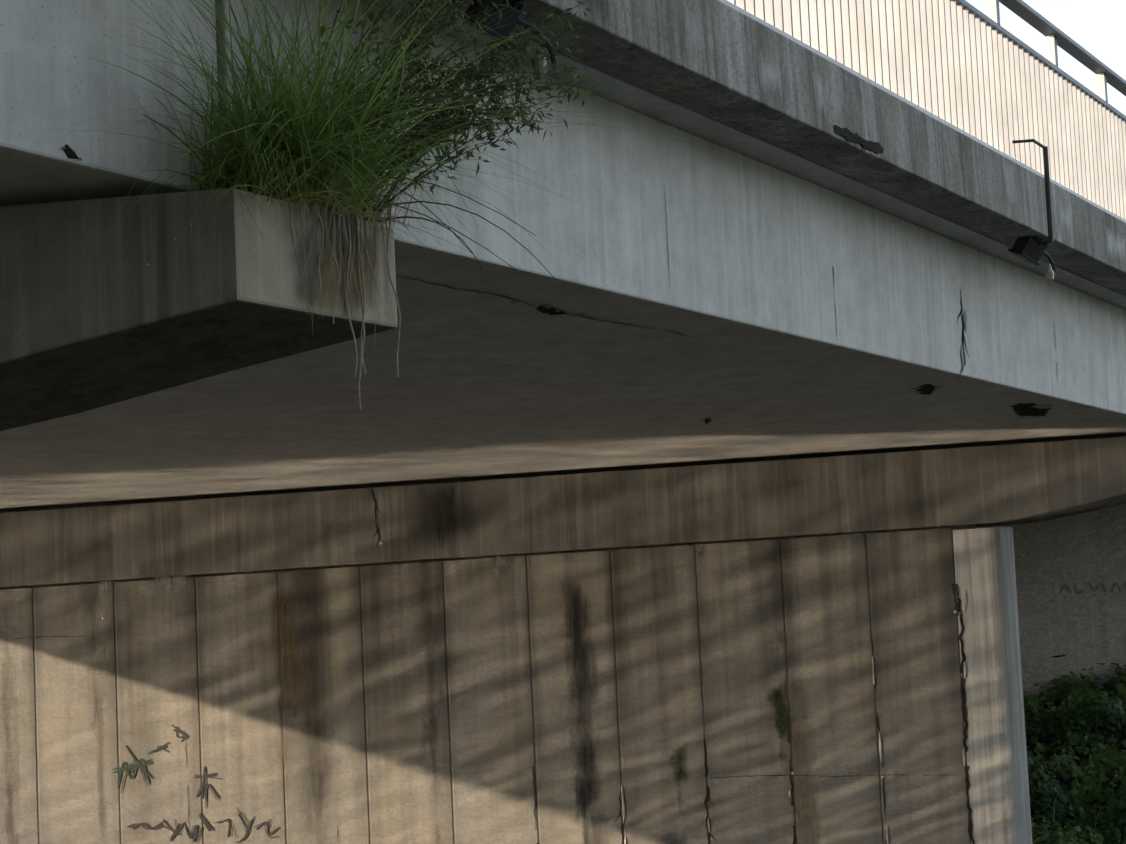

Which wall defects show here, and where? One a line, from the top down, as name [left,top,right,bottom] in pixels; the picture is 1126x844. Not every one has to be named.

spalling [834,125,884,154]
crack [957,289,969,380]
spalling [1010,403,1052,419]
water stain [568,588,596,809]
crack [704,637,891,844]
crack [925,584,975,844]
crack [531,766,539,844]
crack [612,786,626,844]